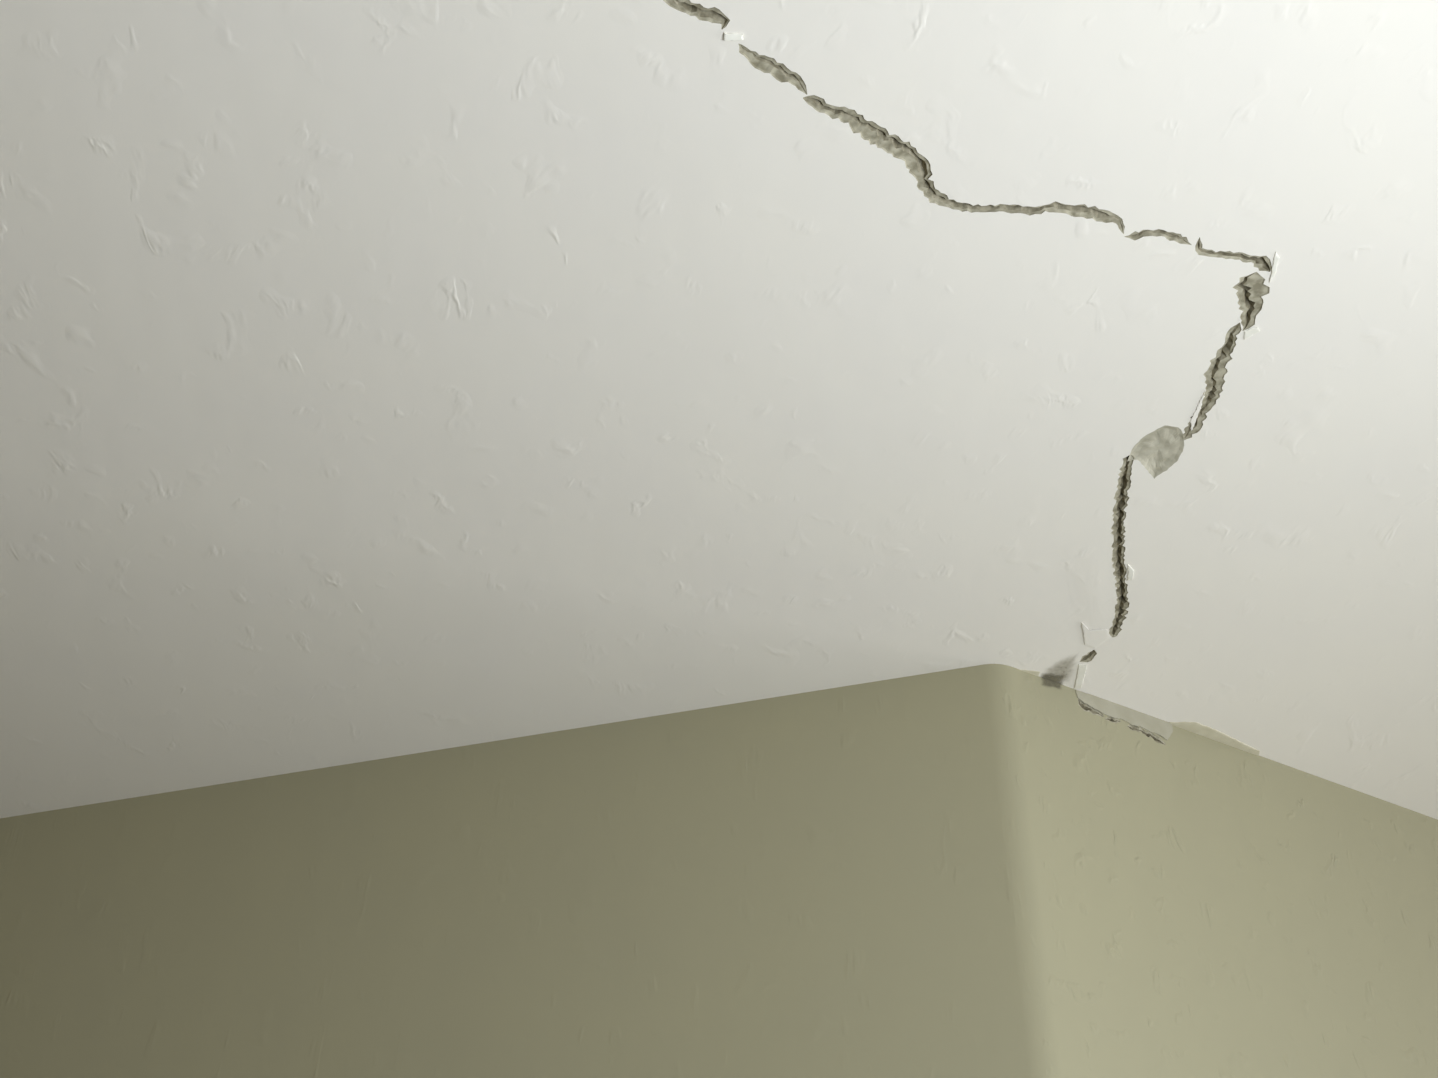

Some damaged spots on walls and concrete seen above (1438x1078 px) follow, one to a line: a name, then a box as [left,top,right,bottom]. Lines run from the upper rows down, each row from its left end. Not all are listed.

crack [663,0,1280,440]
crack [1074,455,1134,689]